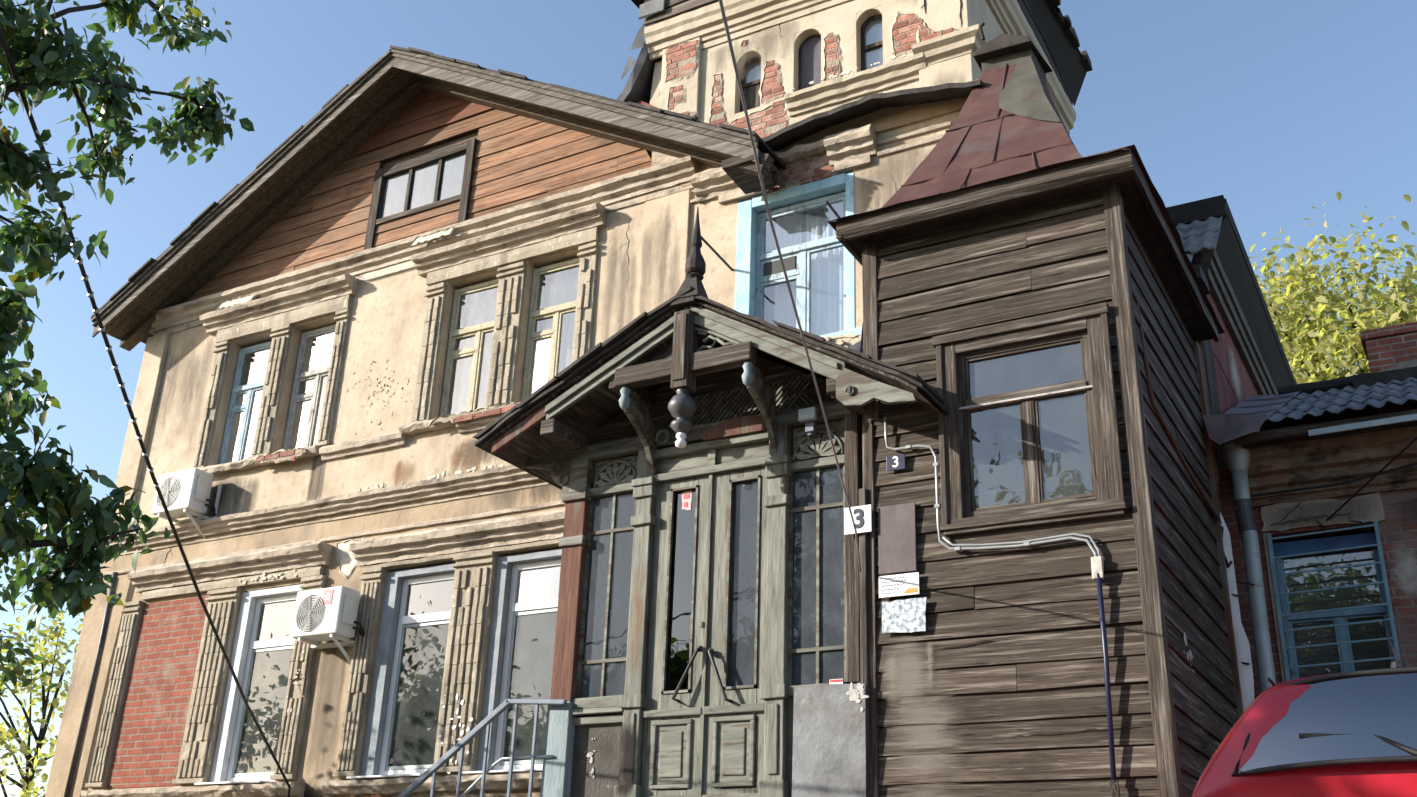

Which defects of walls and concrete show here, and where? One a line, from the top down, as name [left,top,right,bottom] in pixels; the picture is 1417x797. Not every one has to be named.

flaking render [665,12,960,138]
flaking render [770,154,845,195]